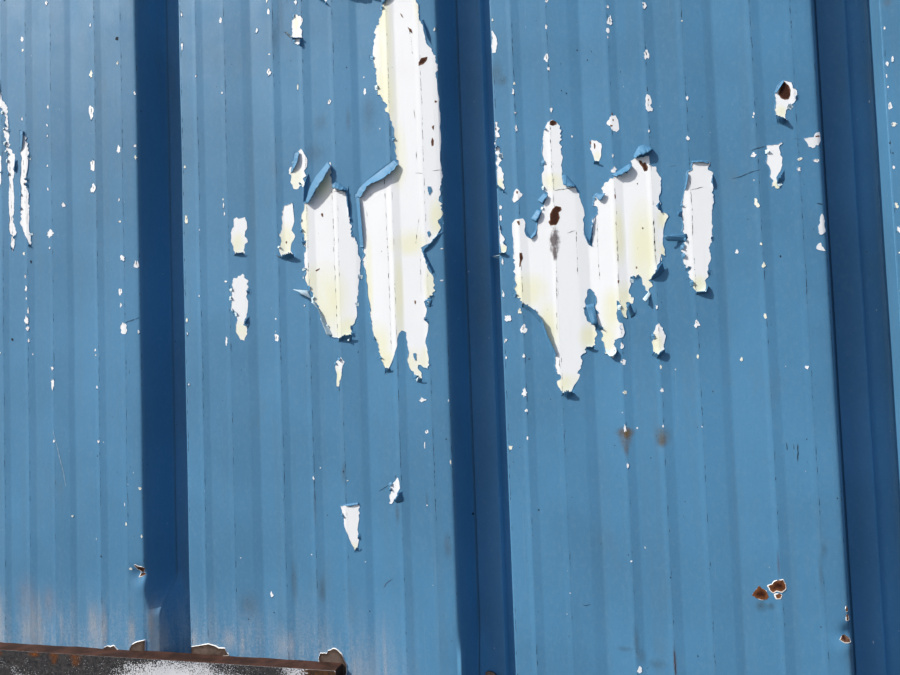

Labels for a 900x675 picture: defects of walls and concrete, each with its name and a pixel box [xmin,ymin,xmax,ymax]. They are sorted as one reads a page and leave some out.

peeling [774,80,799,124]
peeling [0,80,33,255]
peeling [276,0,444,387]
peeling [750,142,785,189]
peeling [796,132,821,172]
peeling [222,199,248,256]
peeling [492,107,715,400]
peeling [224,273,251,346]
peeling [340,503,361,552]
rust [752,579,786,600]